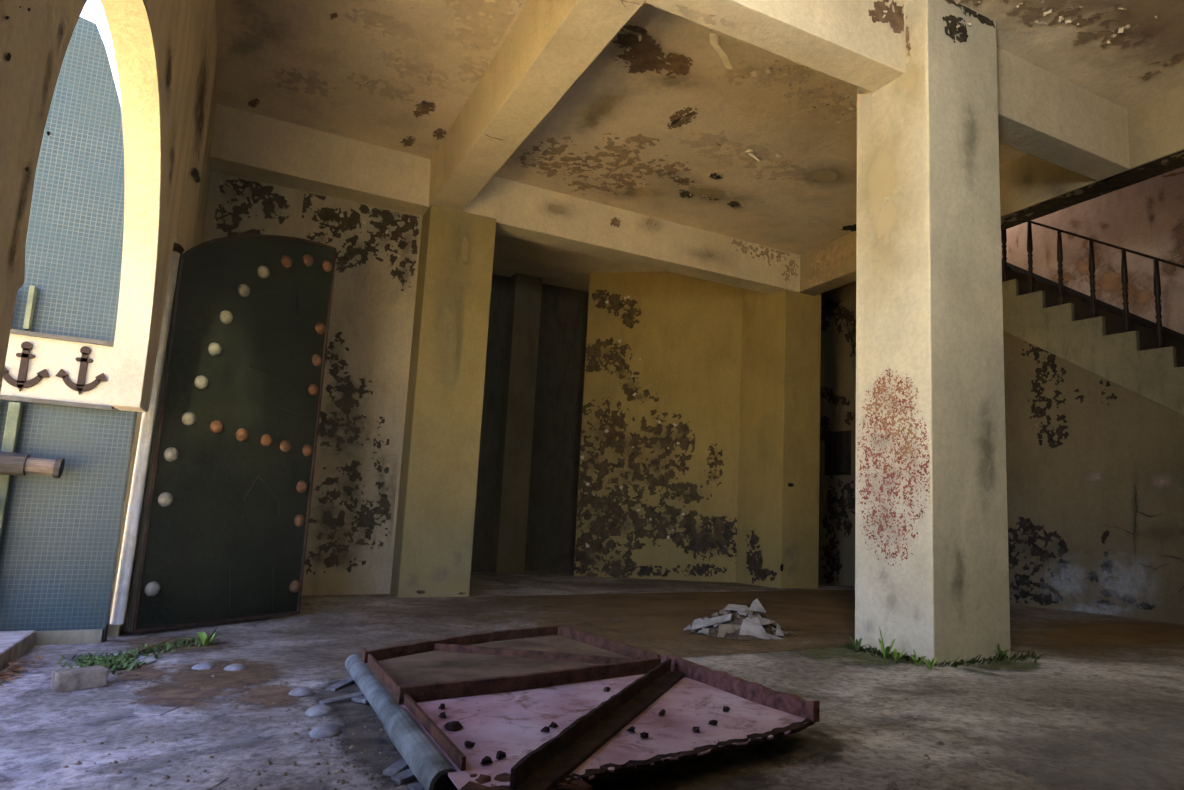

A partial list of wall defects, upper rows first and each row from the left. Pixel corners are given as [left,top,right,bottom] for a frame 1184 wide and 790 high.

peeling [444,0,522,51]
flaking render [612,25,694,78]
flaking render [868,0,911,56]
flaking render [942,0,995,43]
peeling [999,0,1147,49]
flaking render [413,100,436,119]
peeling [518,107,821,210]
peeling [305,331,391,575]
peeling [574,290,784,584]
rust [857,369,930,567]
peeling [1021,341,1084,449]
peeling [1008,517,1155,610]